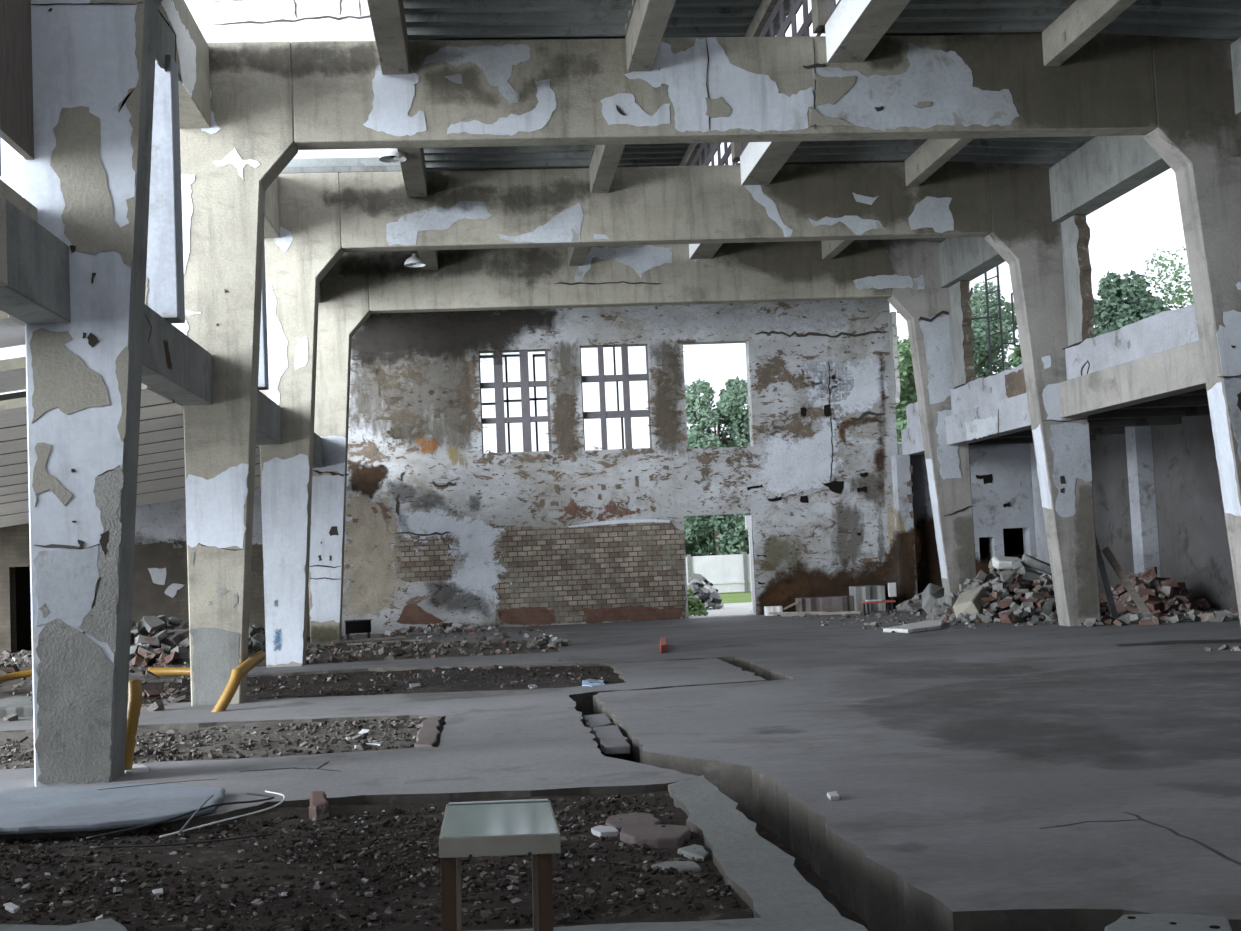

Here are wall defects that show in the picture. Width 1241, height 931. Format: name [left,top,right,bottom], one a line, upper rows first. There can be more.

peeling [50,0,182,266]
peeling [624,44,662,88]
peeling [705,97,732,118]
peeling [803,63,856,127]
peeling [852,192,878,205]
peeling [32,442,72,507]
peeling [30,328,129,441]
flaking render [467,340,689,626]
peeling [691,349,846,509]
peeling [318,484,455,625]
spalling [35,467,124,784]
crack [1039,812,1241,865]